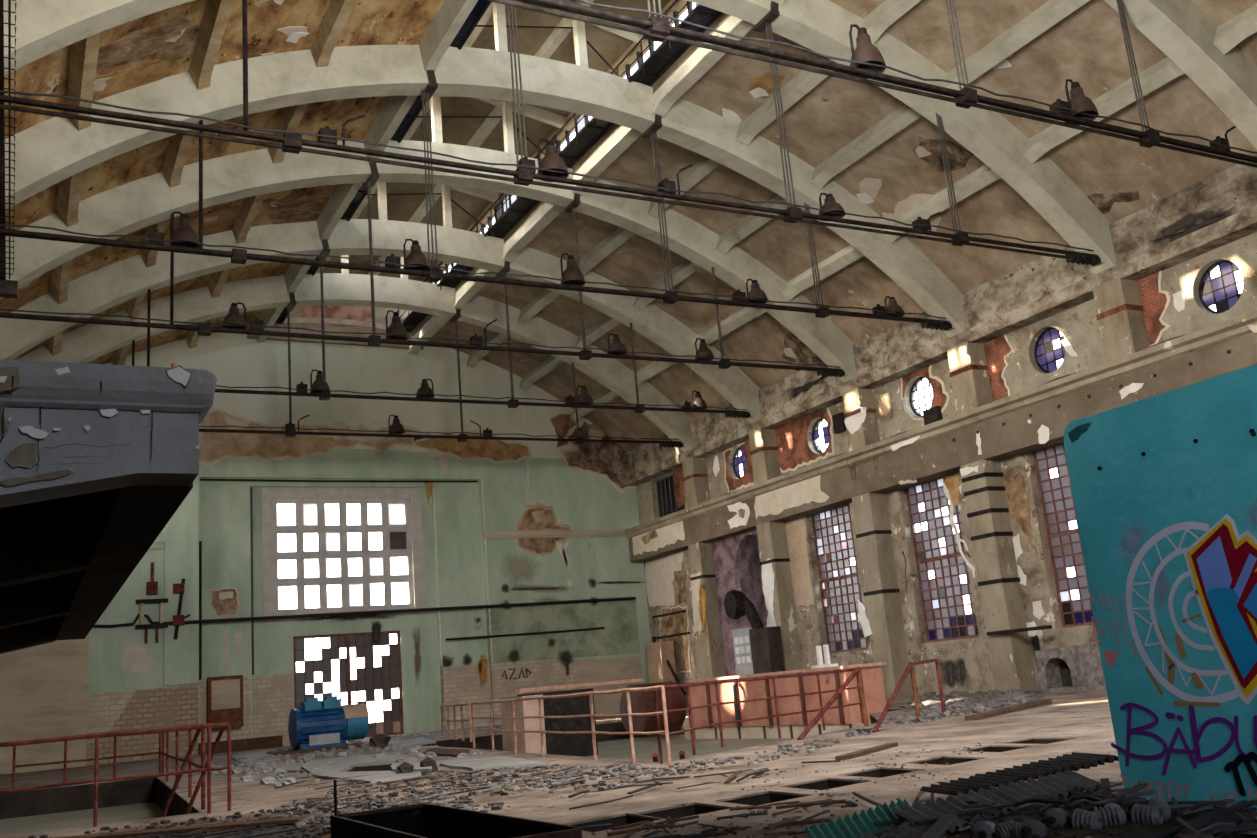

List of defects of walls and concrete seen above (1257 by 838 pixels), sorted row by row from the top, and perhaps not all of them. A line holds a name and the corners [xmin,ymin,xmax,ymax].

peeling [92,11,199,101]
peeling [277,26,310,43]
damp [1155,210,1234,242]
flaking render [1137,271,1185,346]
peeling [0,367,74,486]
peeling [196,408,533,504]
flaking render [550,414,637,494]
flaking render [890,365,950,451]
flaking render [983,335,1014,402]
flaking render [515,503,571,592]
flaking render [713,405,867,607]
peeling [761,558,776,627]